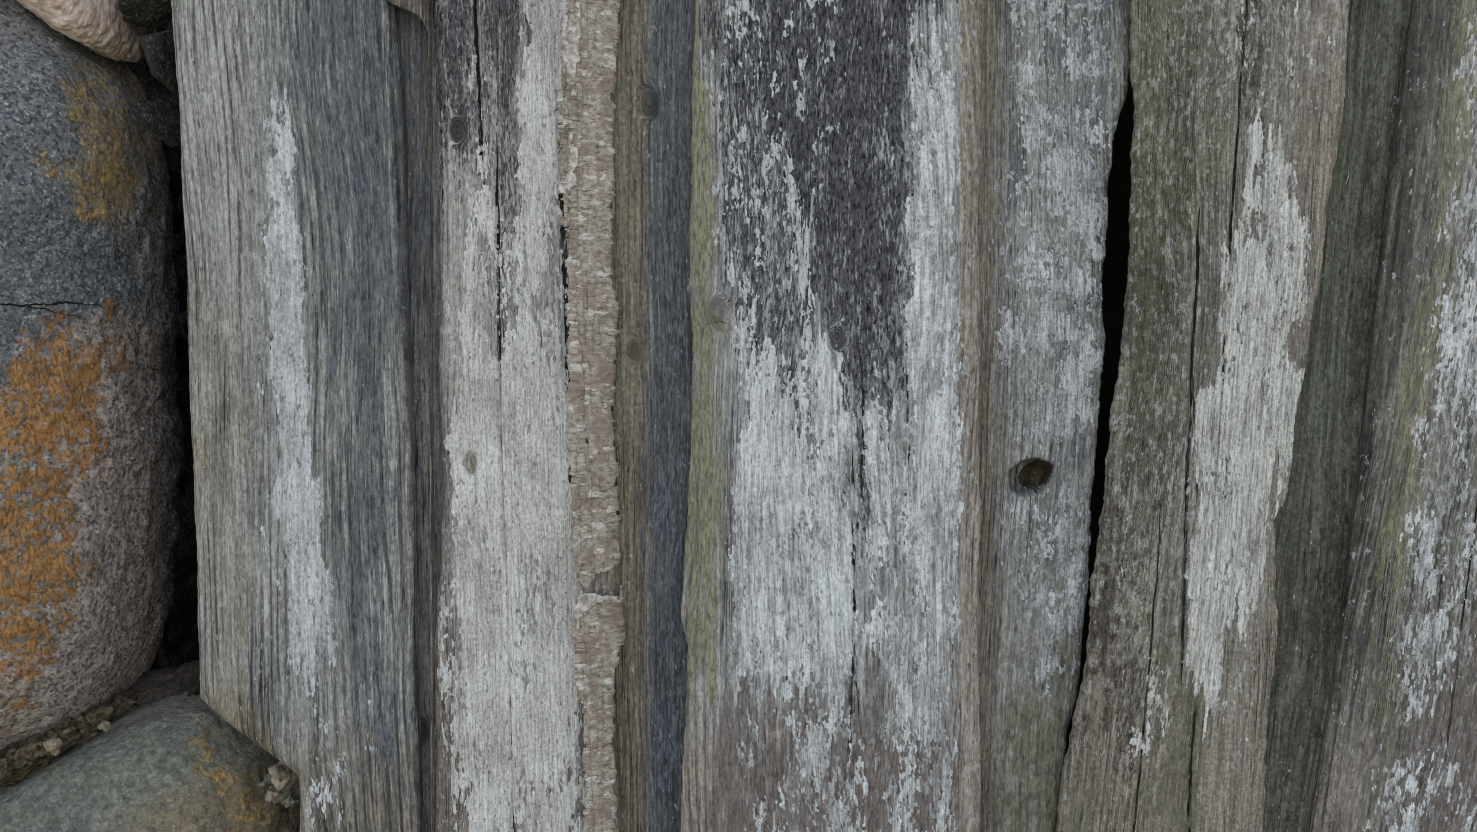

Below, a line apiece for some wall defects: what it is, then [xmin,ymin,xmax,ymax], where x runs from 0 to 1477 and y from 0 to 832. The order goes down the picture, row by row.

crack [0,301,103,320]